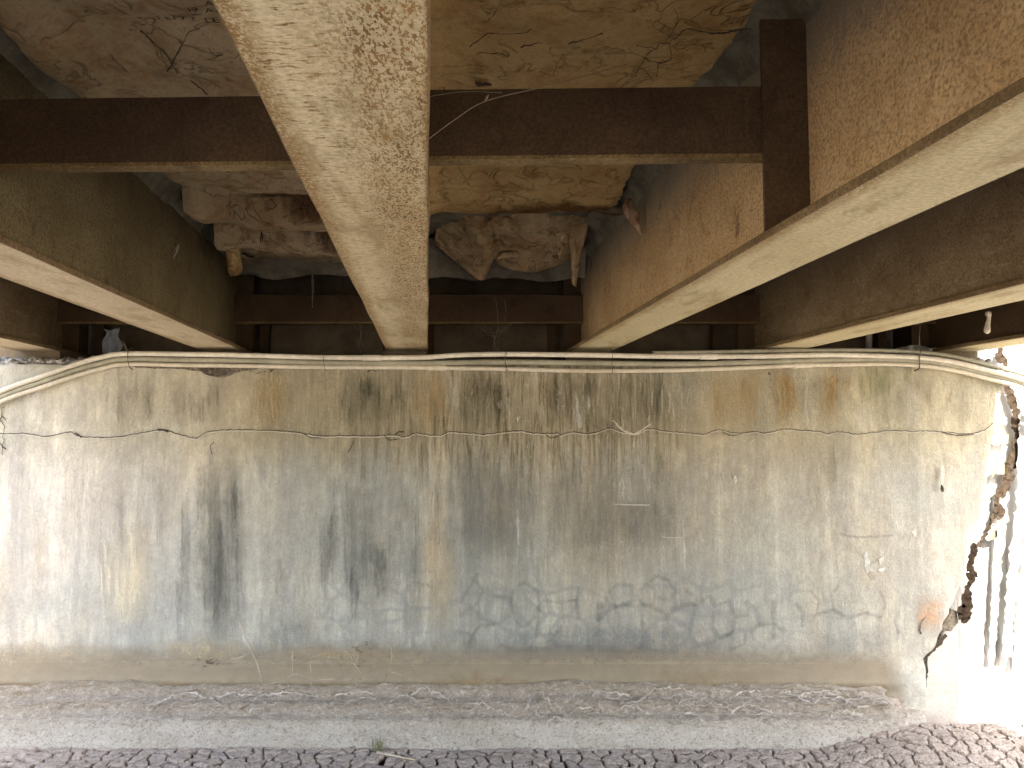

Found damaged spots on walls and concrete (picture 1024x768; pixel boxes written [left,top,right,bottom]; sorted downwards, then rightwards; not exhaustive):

crack [0,348,1021,684]